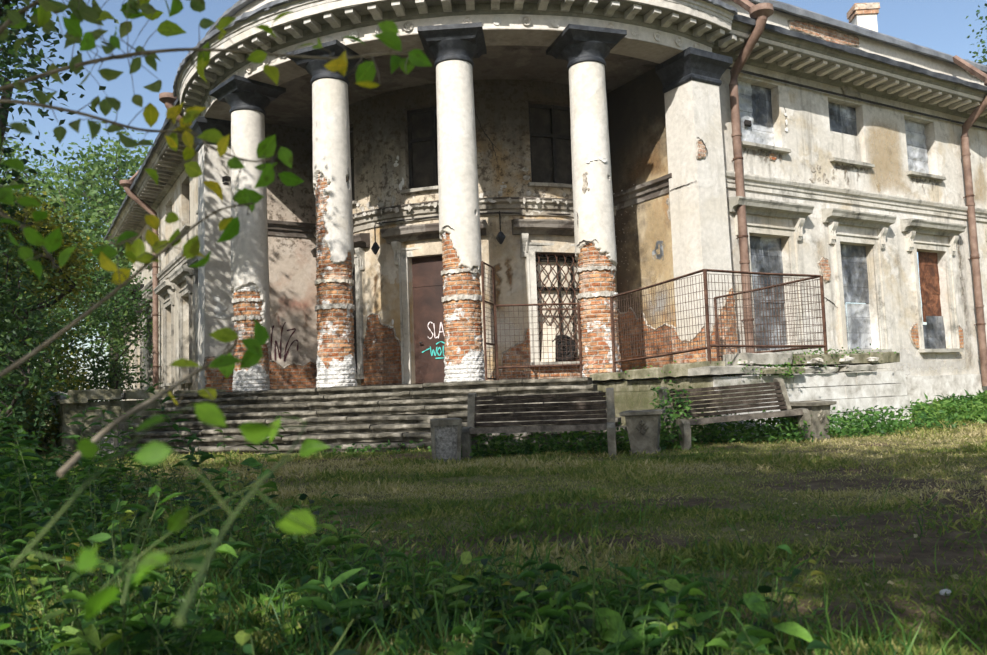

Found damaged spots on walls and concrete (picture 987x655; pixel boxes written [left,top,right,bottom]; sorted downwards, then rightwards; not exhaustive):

spalling [787,20,859,47]
spalling [203,172,402,392]
spalling [441,205,738,382]